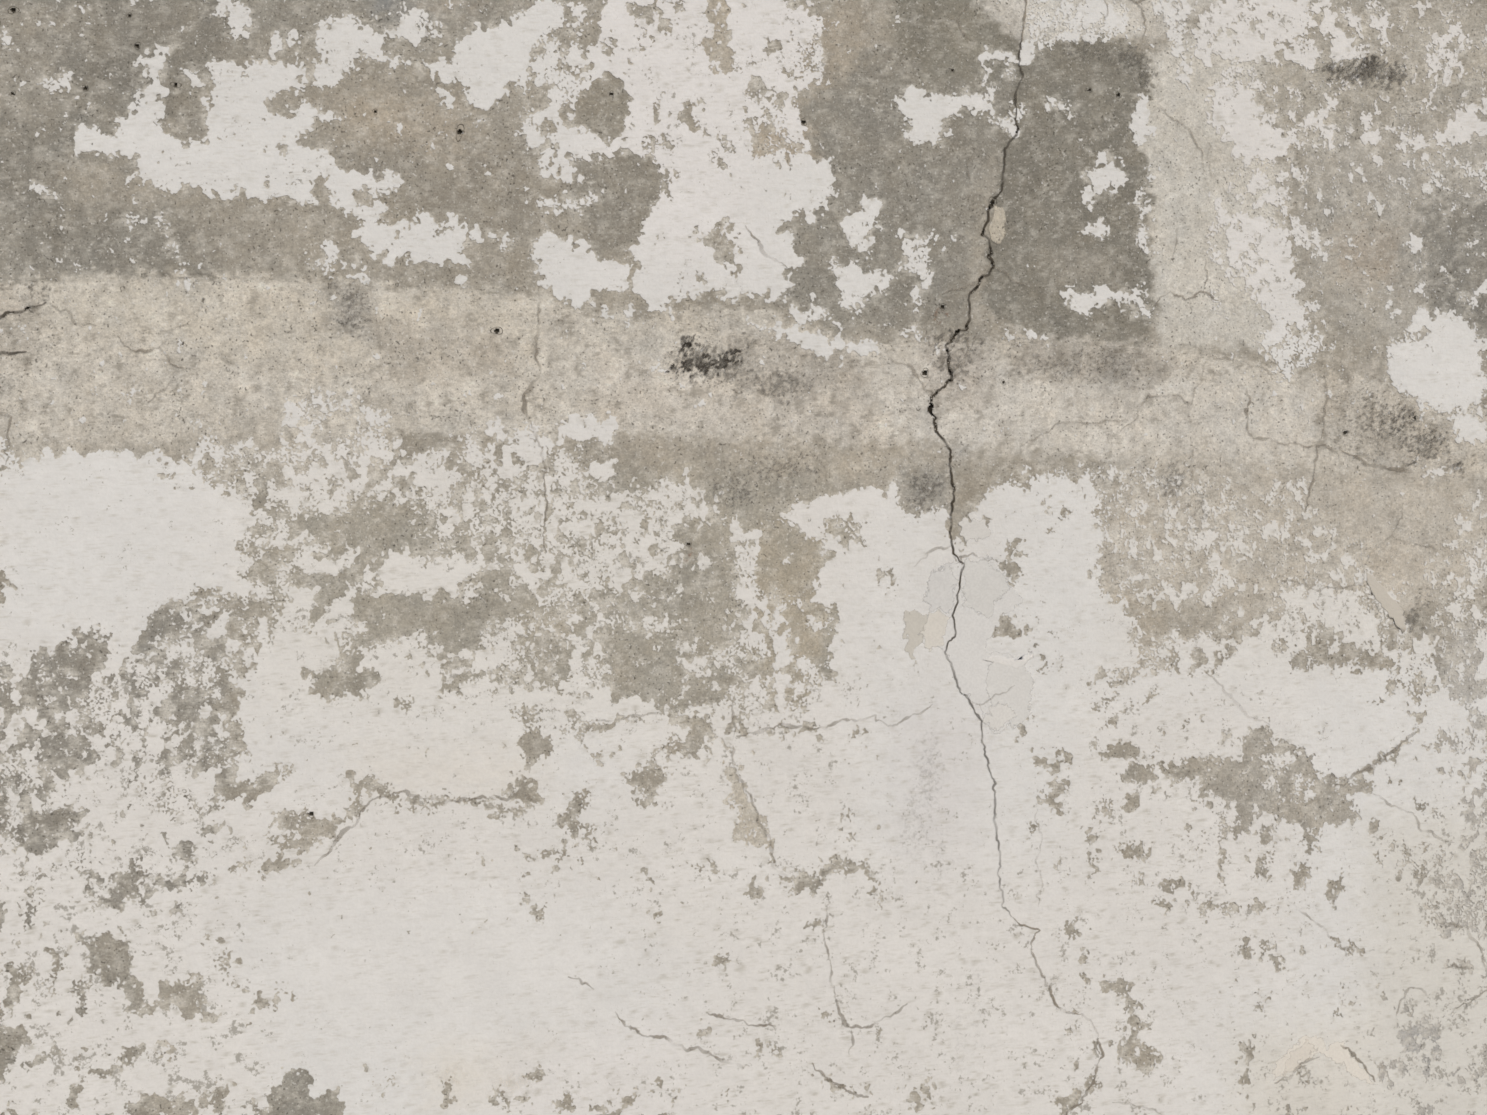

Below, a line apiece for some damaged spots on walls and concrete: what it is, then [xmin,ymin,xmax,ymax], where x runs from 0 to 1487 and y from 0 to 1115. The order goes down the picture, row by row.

peeling [698,0,756,81]
crack [0,302,47,355]
crack [927,0,1027,649]
peeling [514,788,598,923]
peeling [722,758,894,910]
crack [968,699,992,776]
peeling [1026,747,1073,840]
peeling [1082,717,1413,924]
peeling [0,924,222,1113]
peeling [105,1067,346,1115]
crack [1014,918,1105,1115]
peeling [1050,916,1163,1115]